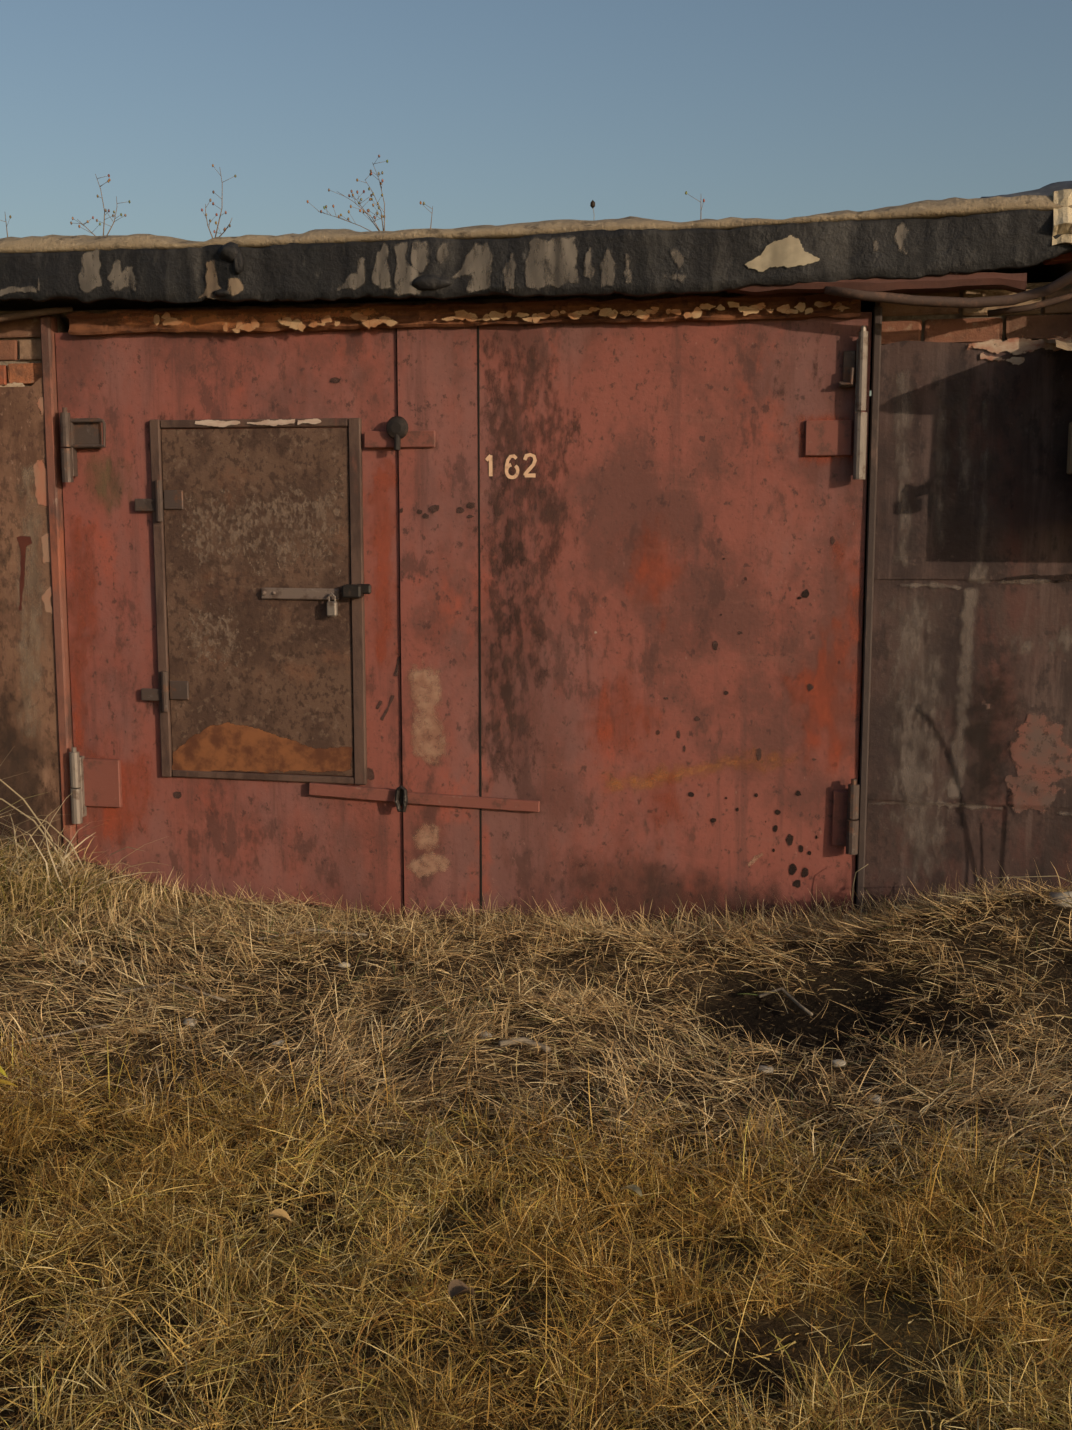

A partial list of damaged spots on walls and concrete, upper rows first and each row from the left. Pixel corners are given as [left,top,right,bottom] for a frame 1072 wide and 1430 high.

peeling [0,277,40,296]
peeling [79,249,136,293]
peeling [199,261,243,299]
peeling [337,242,422,295]
peeling [665,249,685,282]
spalling [745,235,820,272]
peeling [895,223,908,254]
spalling [1042,189,1072,283]
leakage [896,373,911,564]
leakage [892,408,1008,874]
leakage [0,514,45,852]